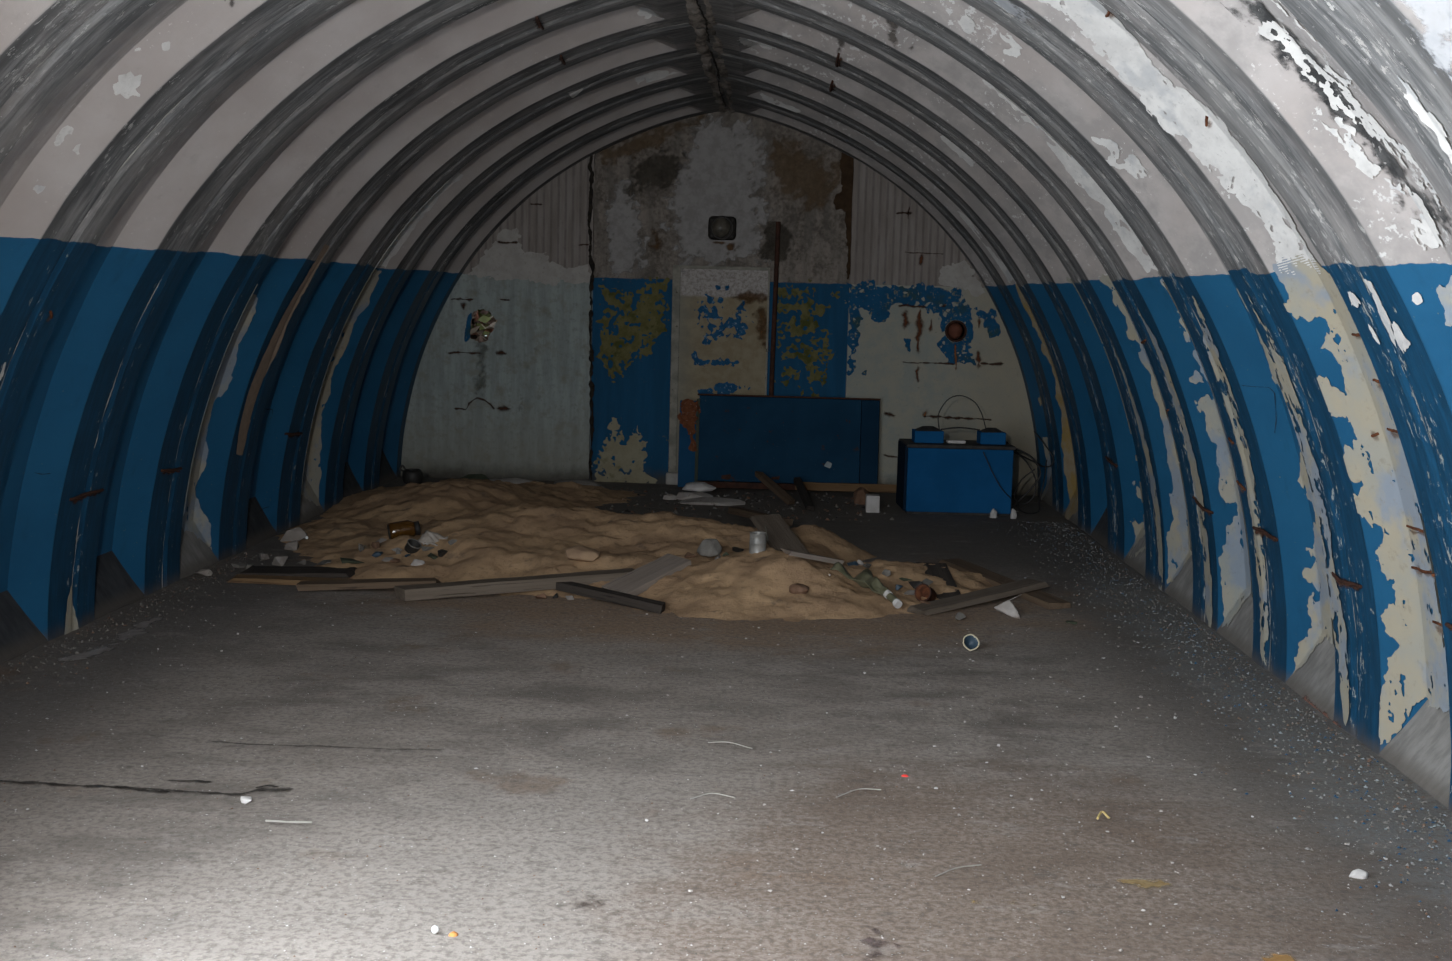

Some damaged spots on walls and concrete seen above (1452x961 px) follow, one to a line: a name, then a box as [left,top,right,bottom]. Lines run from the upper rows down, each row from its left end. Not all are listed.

crack [696,0,727,107]
peeling [958,11,975,34]
peeling [1000,32,1022,58]
peeling [940,135,975,167]
leakage [596,113,792,383]
peeling [691,285,754,399]
peeling [957,211,1078,520]
peeling [982,79,1278,665]
peeling [1038,0,1452,745]
peeling [592,417,658,484]